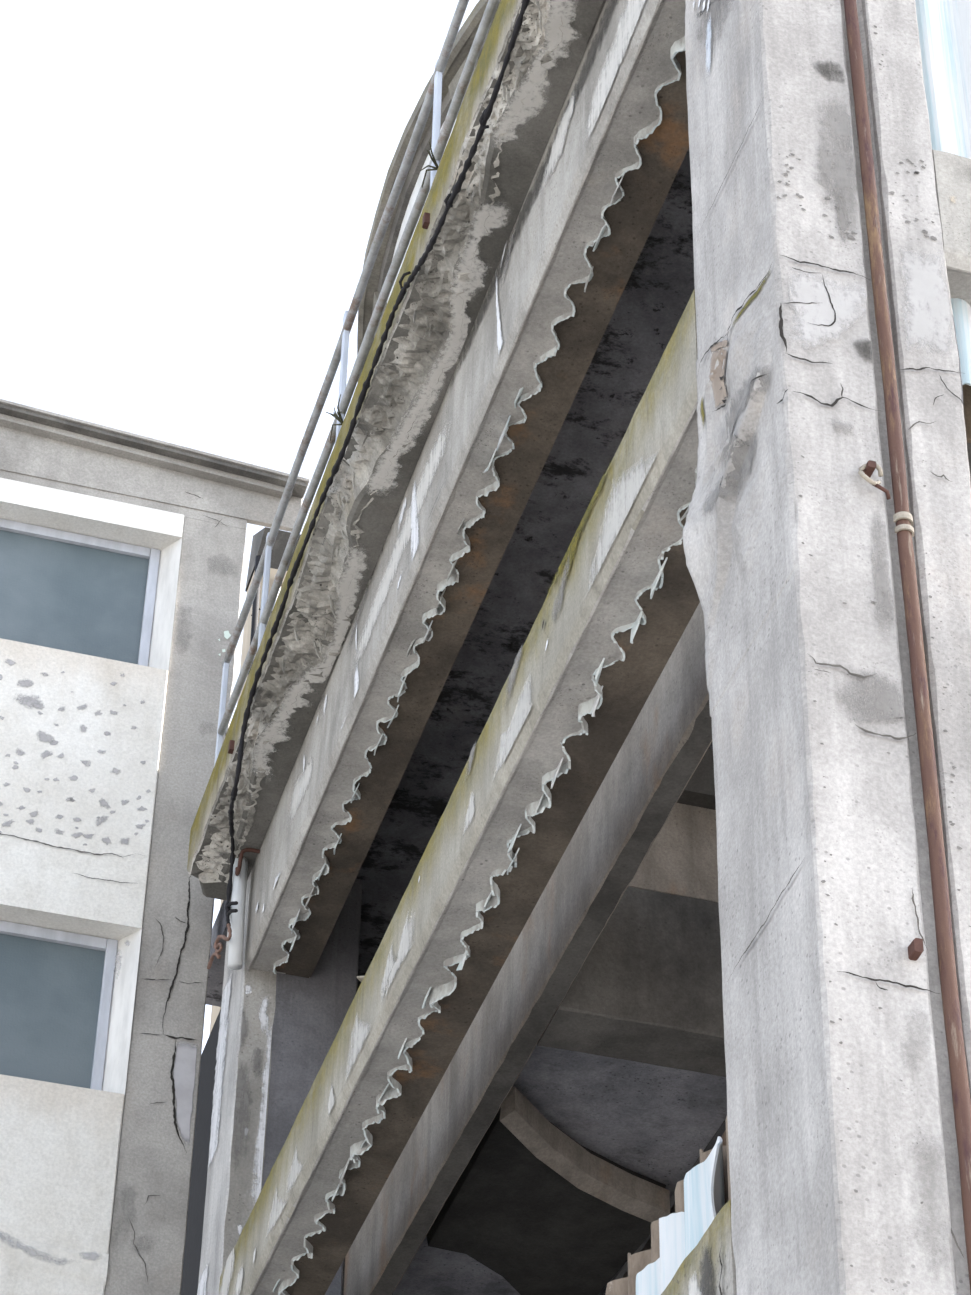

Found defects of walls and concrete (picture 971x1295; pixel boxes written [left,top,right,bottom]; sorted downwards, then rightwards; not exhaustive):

damp [367,0,645,492]
spalling [192,0,564,883]
spalling [709,340,727,407]
crack [698,255,878,411]
crack [901,367,963,430]
damp [592,458,654,584]
damp [252,426,446,775]
damp [17,671,144,758]
damp [0,749,150,845]
crack [140,876,201,1151]
crack [837,971,940,994]
crack [912,887,929,953]